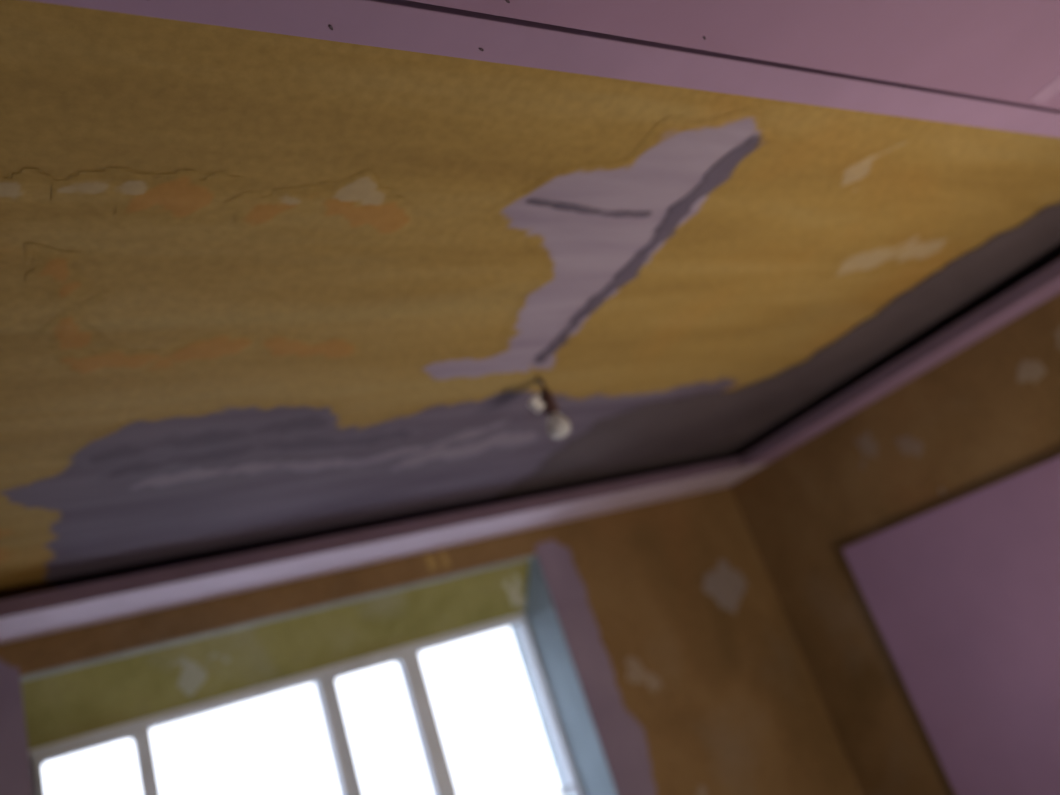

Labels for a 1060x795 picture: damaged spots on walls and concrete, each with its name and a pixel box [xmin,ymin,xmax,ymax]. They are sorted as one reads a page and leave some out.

peeling [477,204,1060,508]